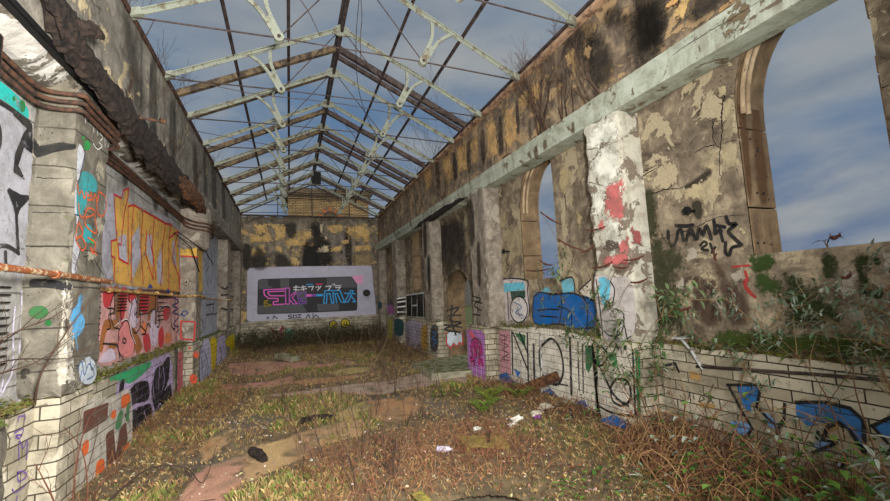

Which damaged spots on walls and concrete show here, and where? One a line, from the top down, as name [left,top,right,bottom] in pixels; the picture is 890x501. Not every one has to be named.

peeling [565,46,591,70]
leakage [570,26,612,87]
leakage [605,0,666,64]
peeling [665,0,690,19]
leakage [690,0,720,20]
crack [695,95,736,179]
peeling [558,117,642,266]
spalling [248,223,372,266]